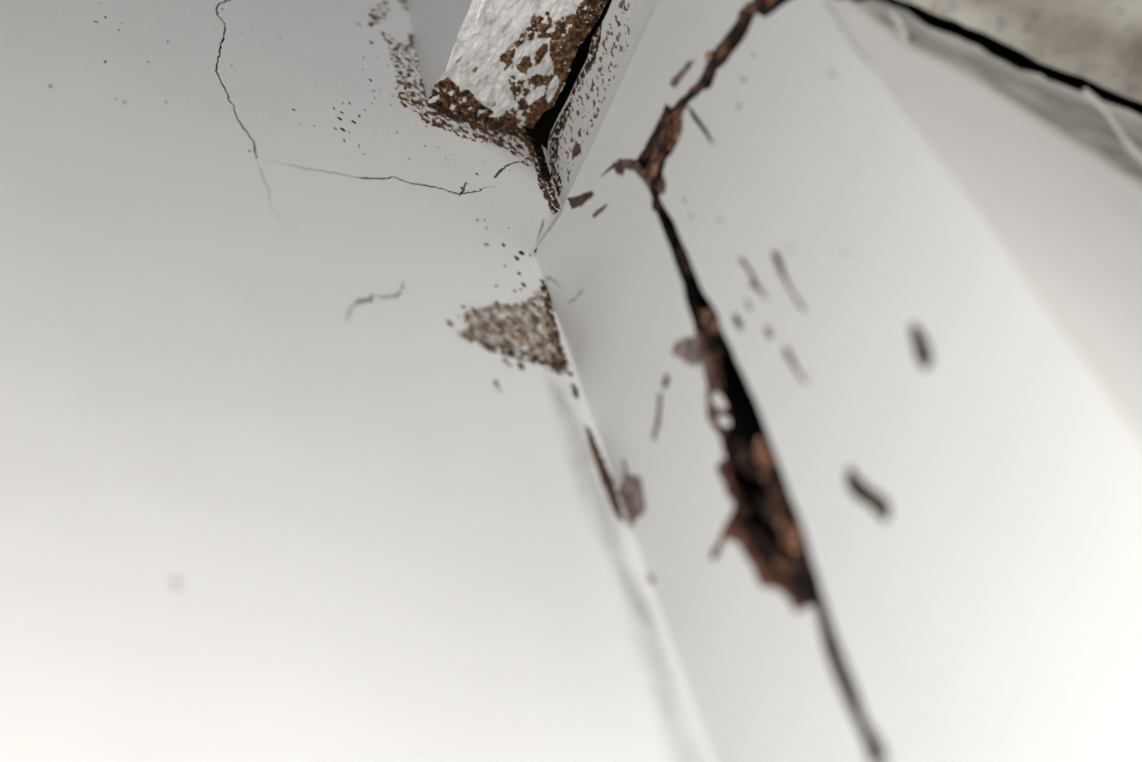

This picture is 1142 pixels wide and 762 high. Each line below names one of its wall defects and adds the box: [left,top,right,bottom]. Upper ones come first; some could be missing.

crack [215,0,257,159]
crack [359,0,612,197]
spalling [362,0,630,219]
peeling [670,60,696,88]
crack [841,0,1142,116]
spalling [457,243,573,377]
crack [612,0,828,615]